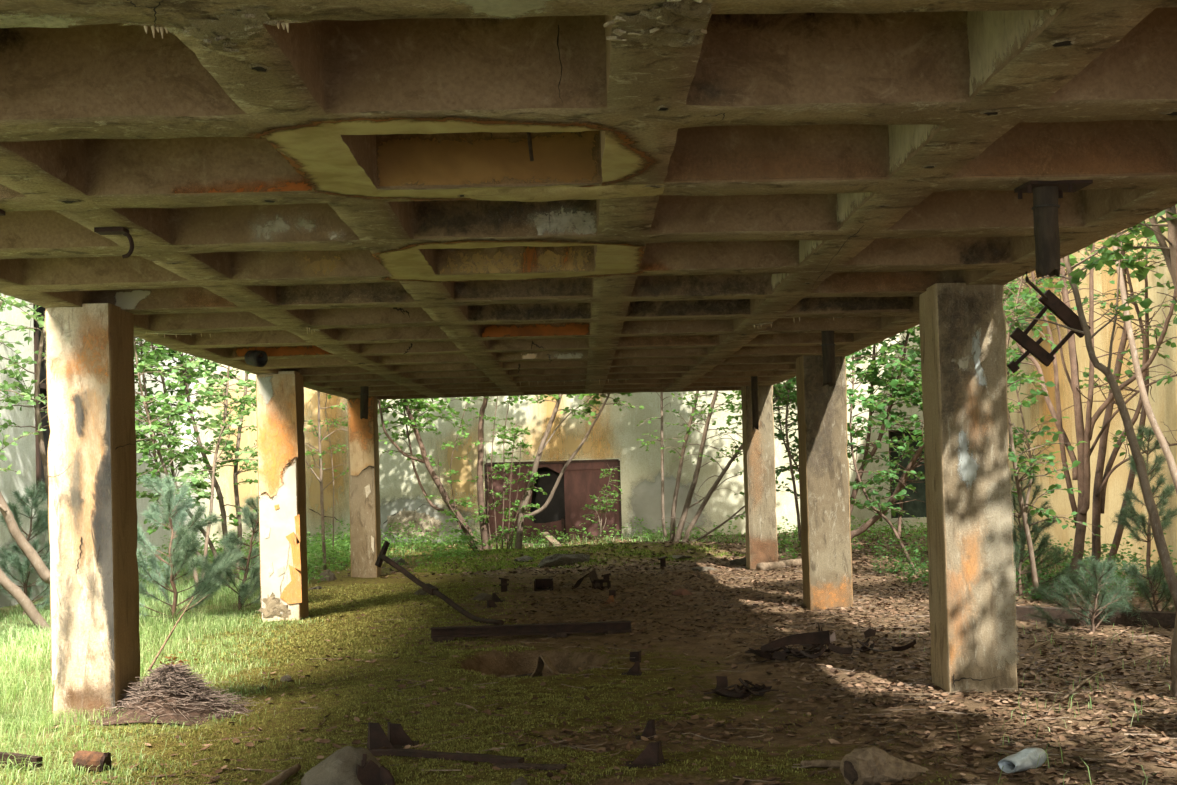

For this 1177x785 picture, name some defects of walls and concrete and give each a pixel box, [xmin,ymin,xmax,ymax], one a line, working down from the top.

water stain [246,117,823,321]
water stain [45,317,68,363]
rust [481,322,590,337]
water stain [0,394,115,716]
spalling [256,374,302,620]
peeling [348,410,374,498]